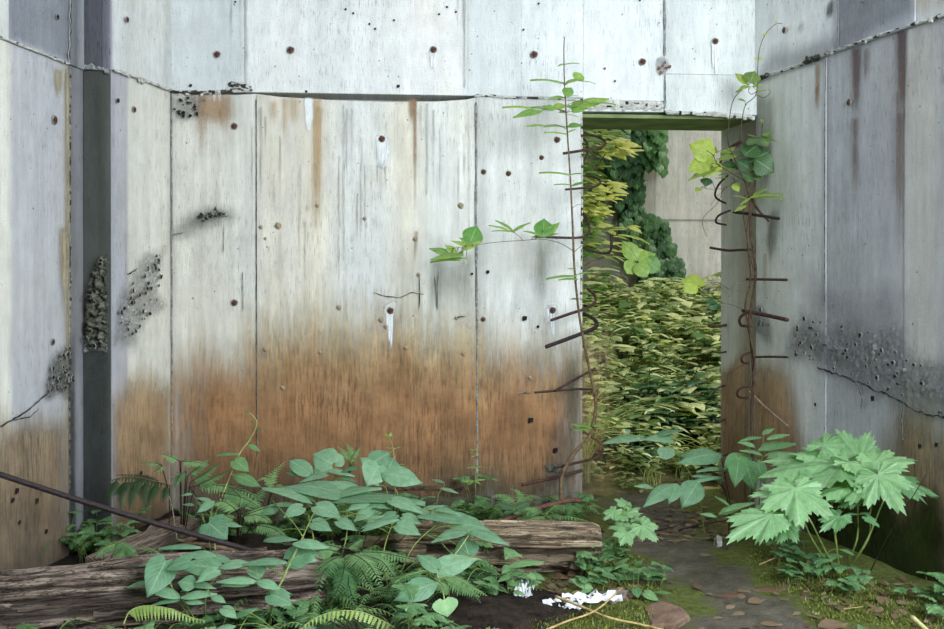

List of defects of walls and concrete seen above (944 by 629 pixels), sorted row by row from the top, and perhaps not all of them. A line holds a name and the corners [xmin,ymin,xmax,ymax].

crack [0,0,72,64]
spalling [170,81,253,118]
rust [846,48,867,105]
rust [897,31,906,206]
spalling [196,208,225,222]
spalling [48,254,163,398]
efflorescence [383,301,396,347]
efflorescence [546,305,557,337]
spalling [707,306,944,415]
crack [0,392,49,427]
rust [720,350,800,503]